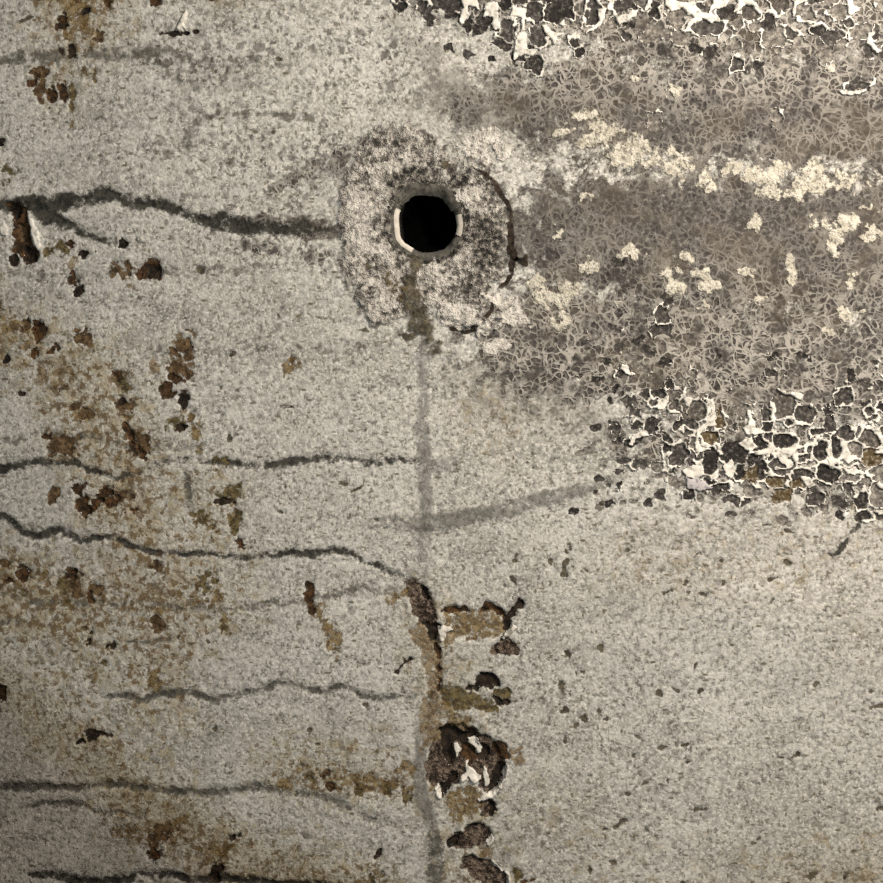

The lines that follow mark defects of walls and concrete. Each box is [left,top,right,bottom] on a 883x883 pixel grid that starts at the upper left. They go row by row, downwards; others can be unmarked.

peeling [391,0,883,78]
peeling [839,75,876,96]
corrosion [109,238,162,290]
crack [0,184,332,245]
crack [448,166,528,334]
water stain [402,0,883,516]
corrosion [149,329,203,454]
water stain [382,255,466,560]
peeling [568,292,883,523]
corrosion [48,478,138,519]
crack [0,433,419,513]
crack [0,512,400,624]